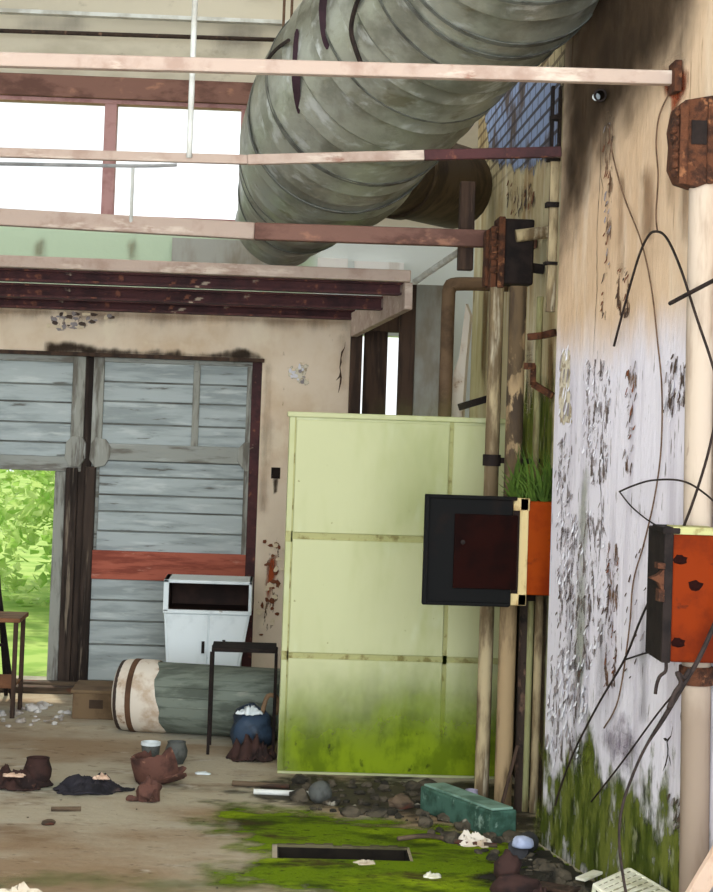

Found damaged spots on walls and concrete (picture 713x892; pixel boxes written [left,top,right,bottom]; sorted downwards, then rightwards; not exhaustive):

peeling [46,311,115,331]
peeling [288,362,309,385]
peeling [663,354,686,422]
spalling [256,540,285,636]
peeling [546,345,643,768]
leakage [229,775,421,823]
leakage [447,781,474,790]
leakage [511,784,598,892]